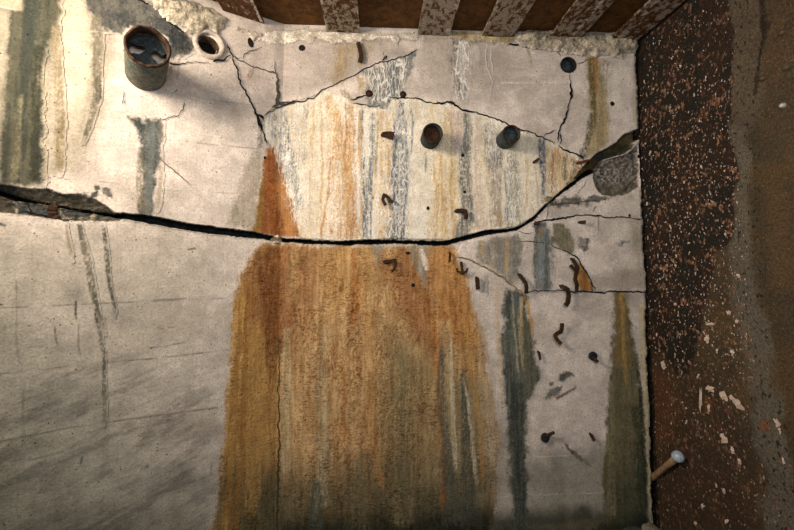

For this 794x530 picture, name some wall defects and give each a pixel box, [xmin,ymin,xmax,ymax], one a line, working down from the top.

water stain [0,0,68,192]
water stain [80,0,199,146]
water stain [123,114,166,216]
crack [169,43,418,143]
crack [0,59,643,294]
rust [209,144,505,530]
water stain [223,35,653,530]